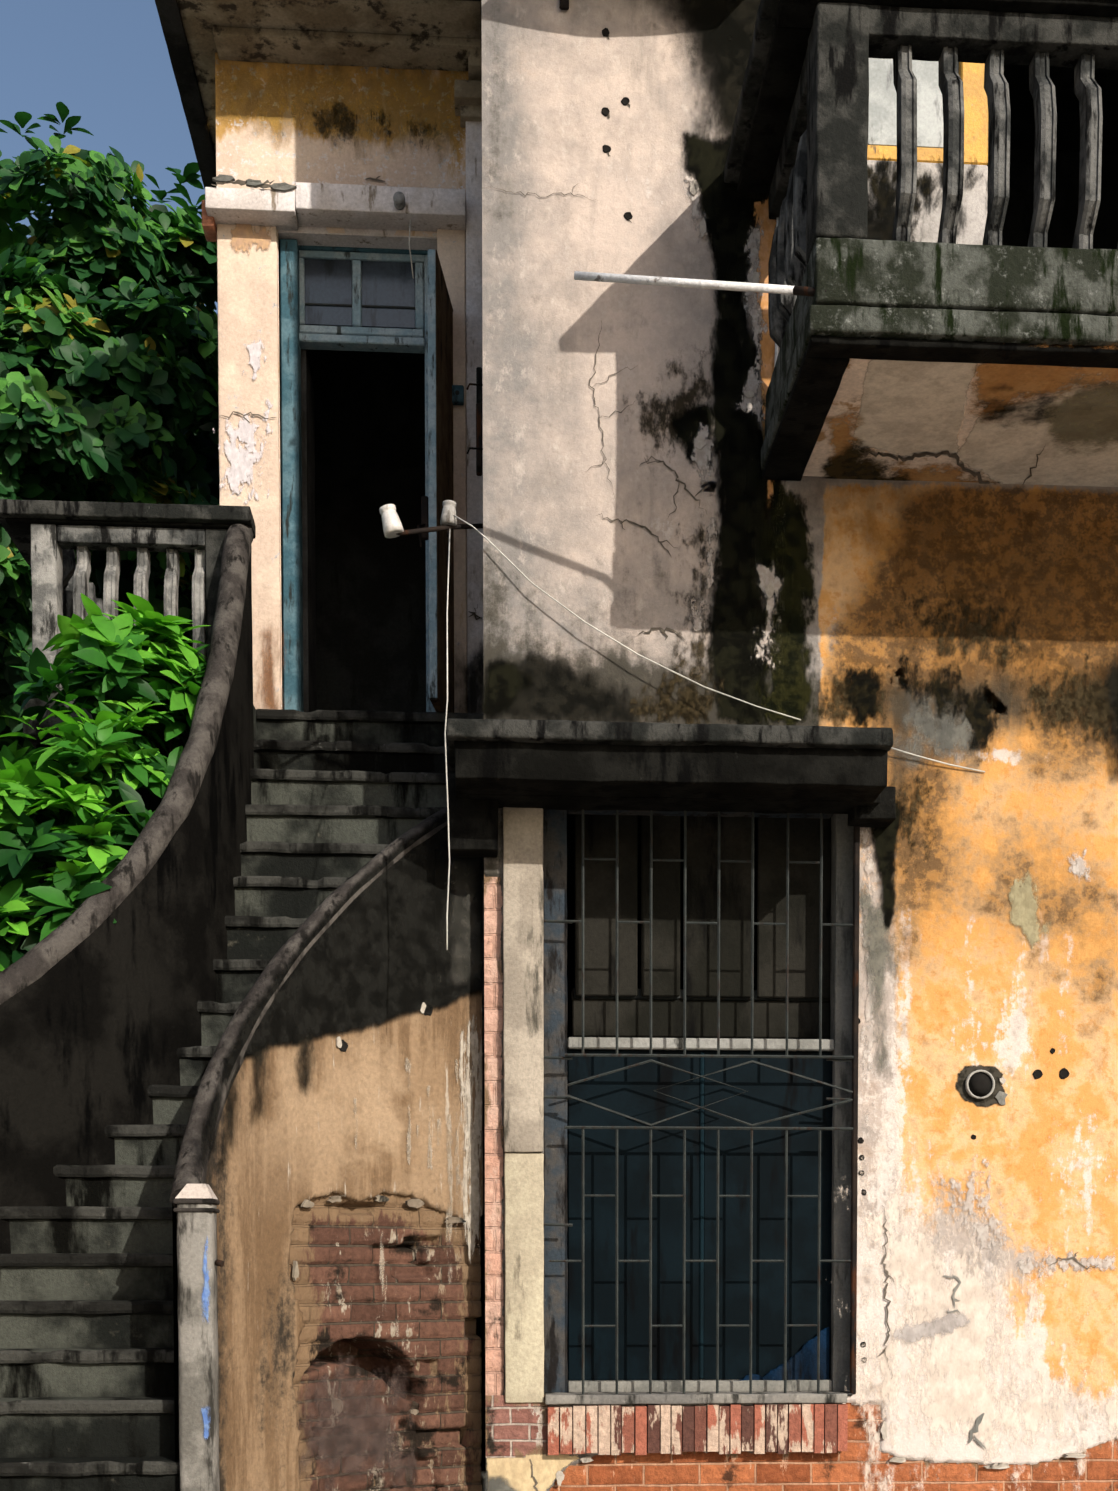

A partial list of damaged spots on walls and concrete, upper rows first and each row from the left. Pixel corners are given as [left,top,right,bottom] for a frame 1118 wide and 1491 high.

leakage [867,156,943,242]
peeling [213,398,273,504]
peeling [243,339,267,380]
leakage [455,112,774,725]
crack [588,321,708,556]
leakage [822,443,909,481]
crack [639,627,686,641]
leakage [1022,655,1118,777]
peeling [1069,849,1090,881]
leakage [201,812,483,1166]
peeling [860,829,879,1082]
flaking render [289,873,1118,1491]